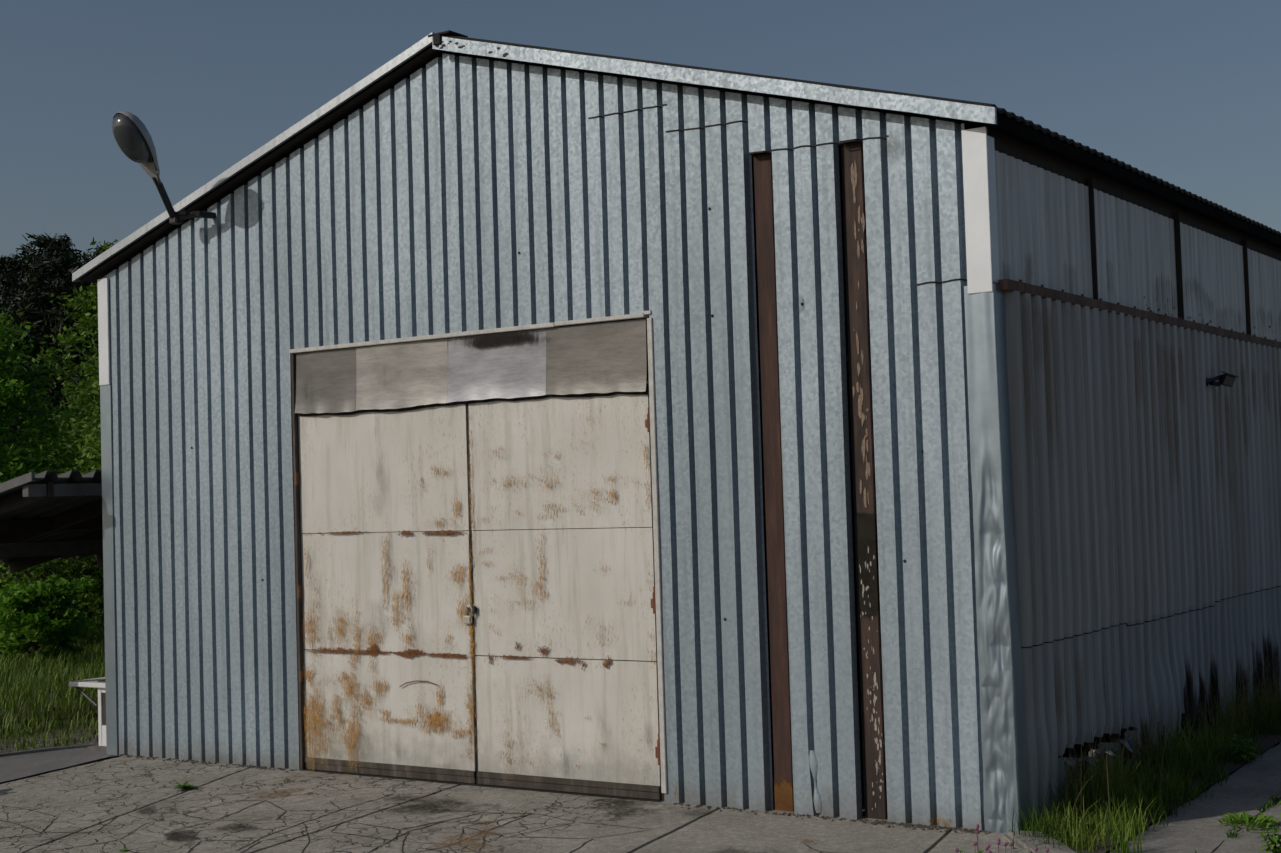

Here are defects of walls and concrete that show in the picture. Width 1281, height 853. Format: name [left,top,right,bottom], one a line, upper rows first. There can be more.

corrosion [490,444,651,609]
corrosion [301,465,585,773]
peeling [859,547,884,810]
crack [0,795,652,853]
corrosion [774,779,793,812]